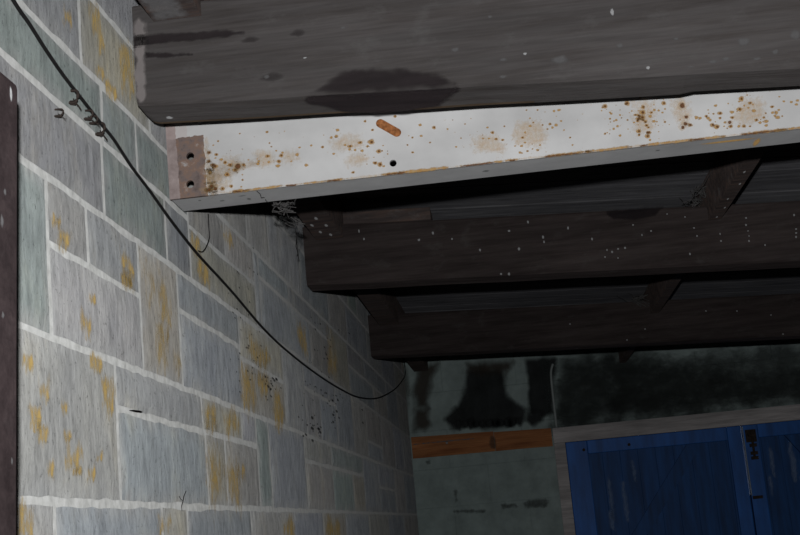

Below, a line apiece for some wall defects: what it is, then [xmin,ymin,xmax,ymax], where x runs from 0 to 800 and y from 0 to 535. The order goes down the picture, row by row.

water stain [306,70,459,113]
rust [207,131,342,193]
rust [344,115,448,176]
rust [464,95,800,166]
water stain [405,366,435,429]
water stain [446,348,800,430]